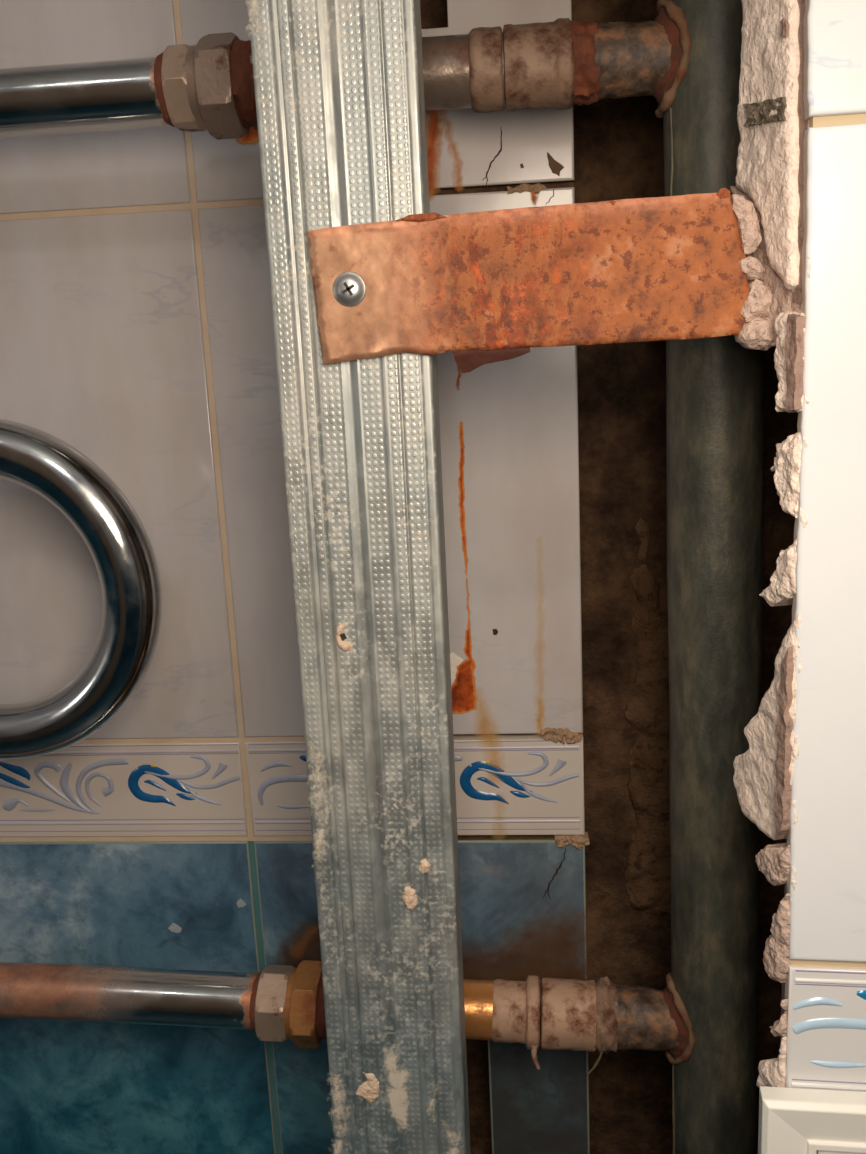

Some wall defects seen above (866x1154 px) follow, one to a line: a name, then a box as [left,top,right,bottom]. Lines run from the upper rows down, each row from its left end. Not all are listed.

flaking render [780,18,790,36]
corrosion [426,110,461,197]
crack [482,130,502,188]
spalling [742,97,787,126]
corrosion [395,213,447,222]
flaking render [730,186,810,413]
corrosion [451,421,477,714]
flaking render [733,432,808,983]
crack [543,849,566,900]
flaking render [756,999,788,1087]